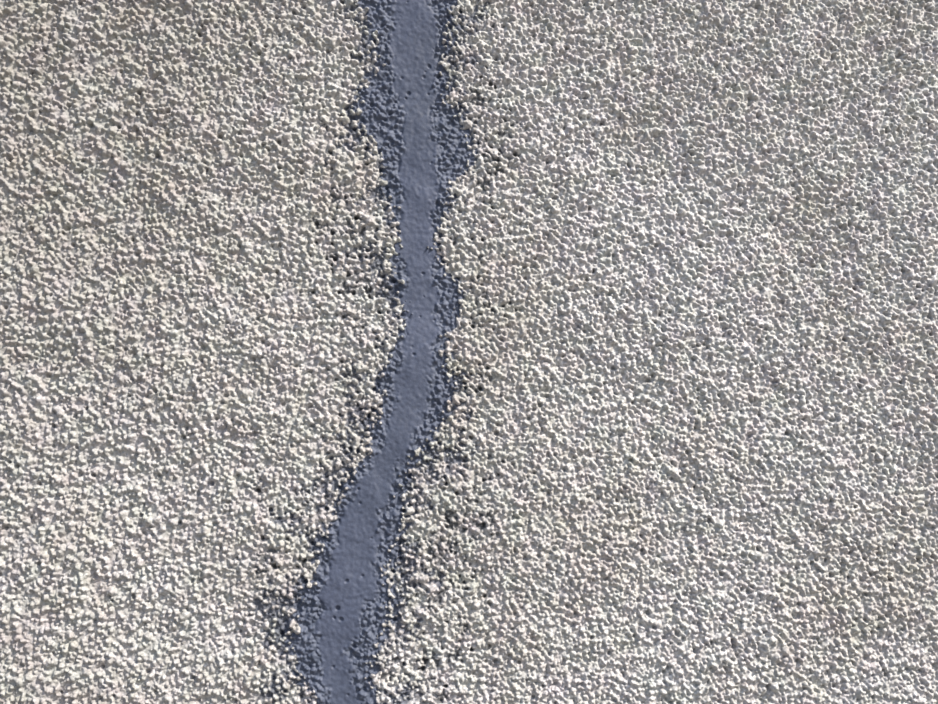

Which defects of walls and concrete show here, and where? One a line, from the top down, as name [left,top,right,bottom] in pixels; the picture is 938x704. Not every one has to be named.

crack [240,0,519,704]